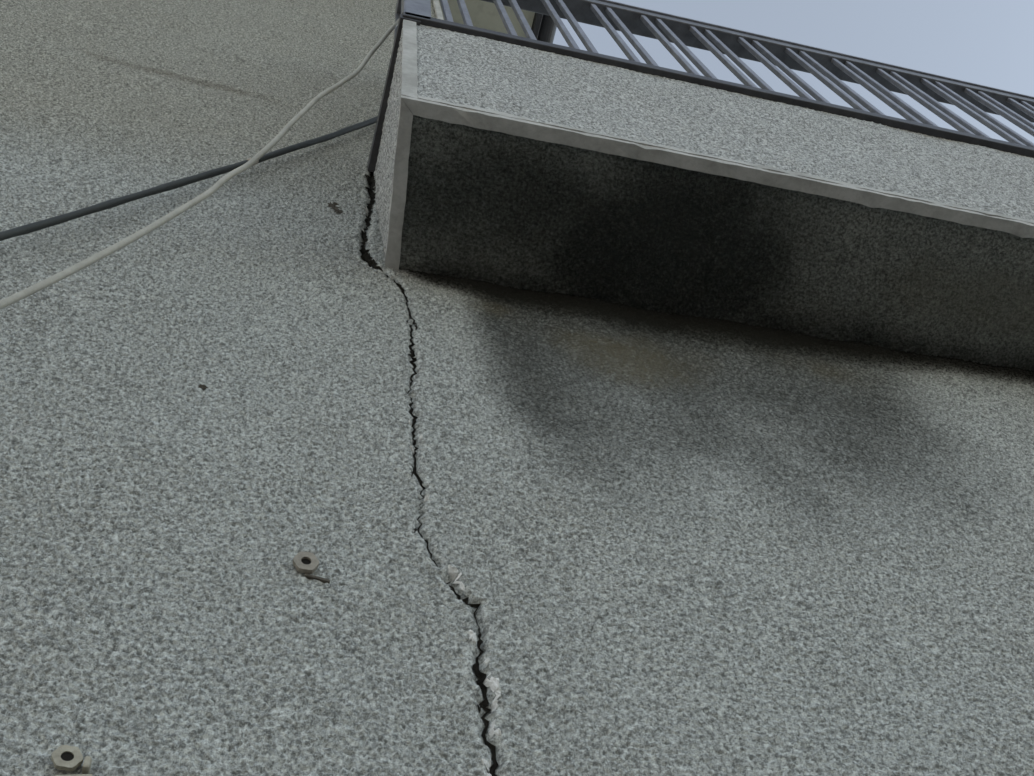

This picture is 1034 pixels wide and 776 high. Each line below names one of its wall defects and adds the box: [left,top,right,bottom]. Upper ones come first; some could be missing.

crack [359,172,502,776]